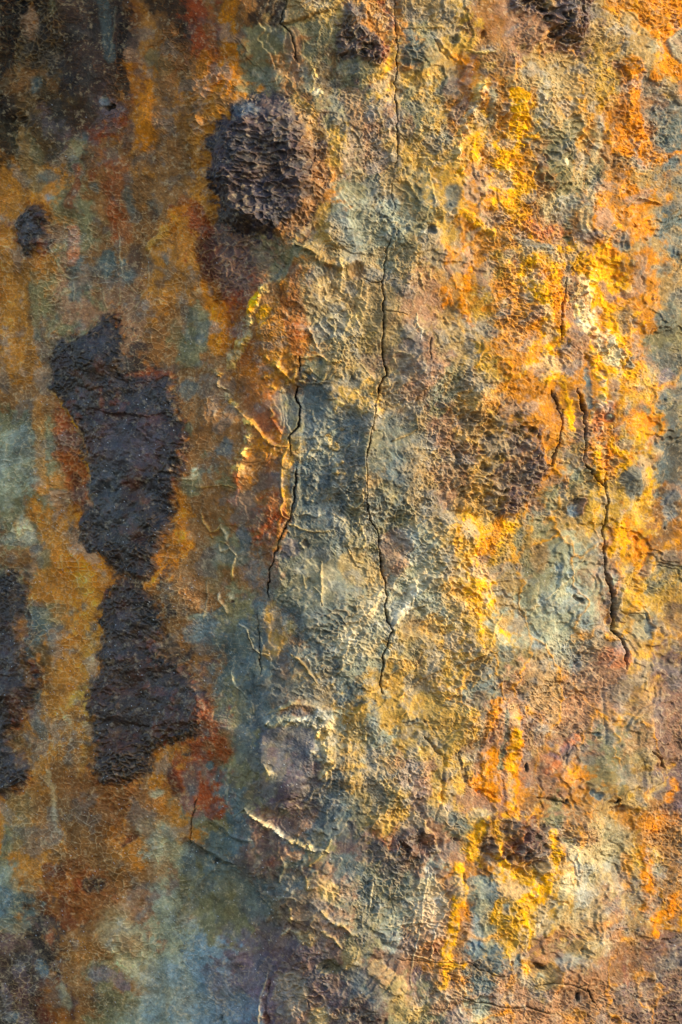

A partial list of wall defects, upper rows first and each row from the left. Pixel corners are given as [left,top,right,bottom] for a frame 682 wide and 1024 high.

corrosion [468,86,539,197]
crack [364,0,409,695]
corrosion [433,235,486,330]
corrosion [517,251,576,432]
crack [246,356,302,675]
crack [550,388,631,671]
corrosion [188,692,236,804]
corrosion [468,696,529,819]
corrosion [37,859,119,933]
corrosion [438,862,476,991]
corrosion [492,828,566,950]
corrosion [632,839,680,940]